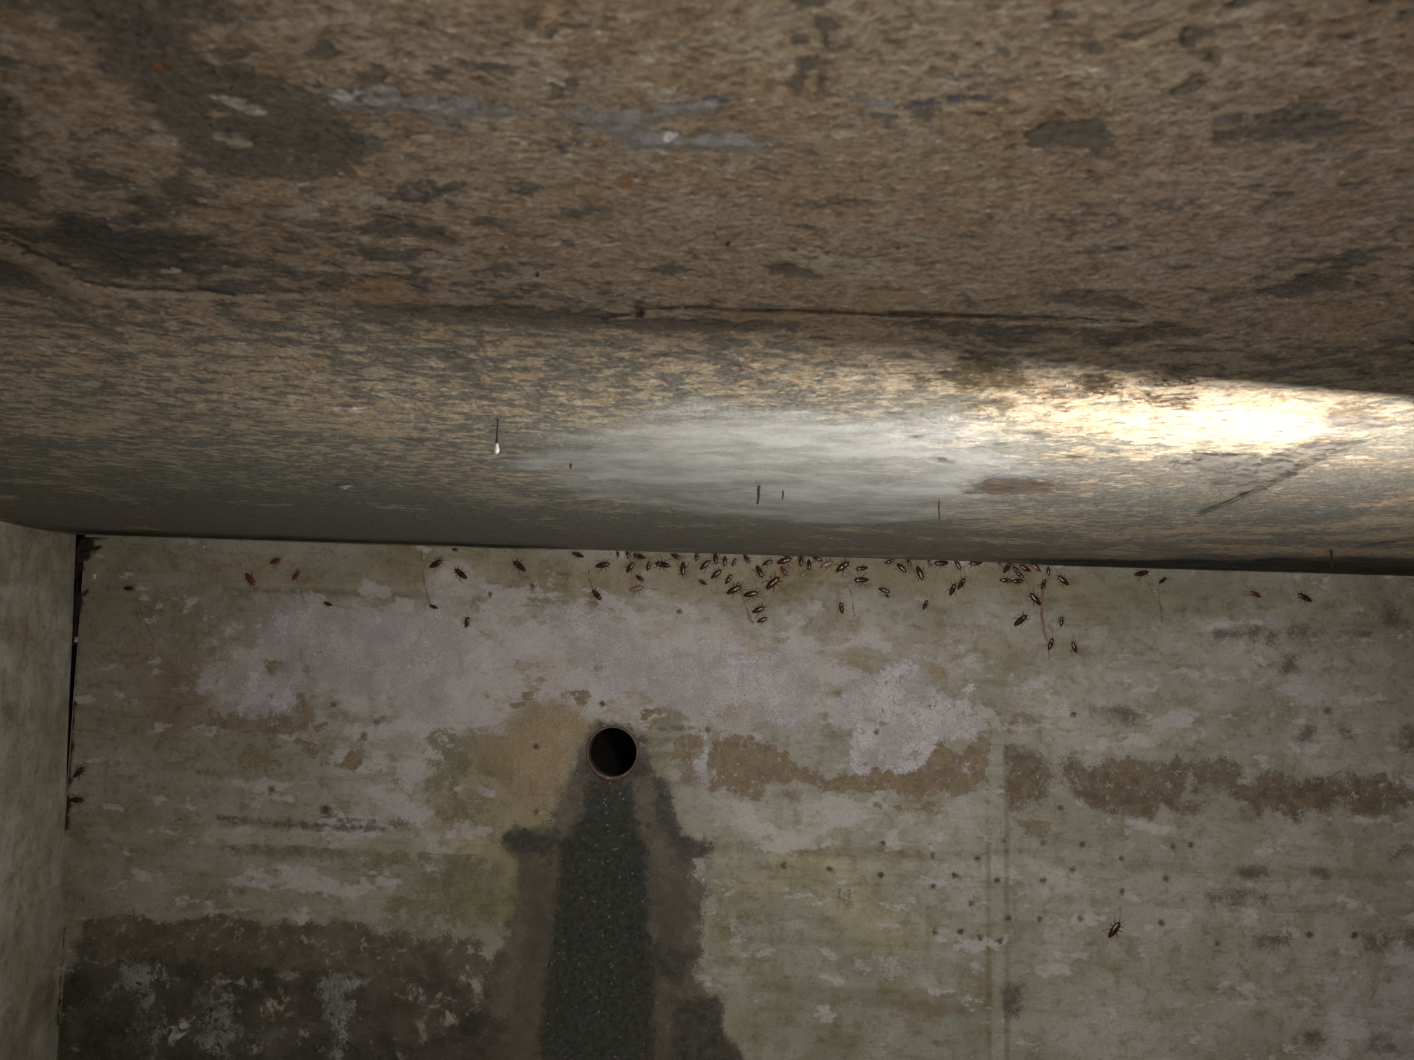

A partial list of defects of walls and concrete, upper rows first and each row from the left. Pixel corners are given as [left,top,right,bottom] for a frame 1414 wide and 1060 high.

crack [602,295,1181,332]
crack [1198,441,1363,516]
damp [671,693,1414,838]
damp [56,690,743,1060]